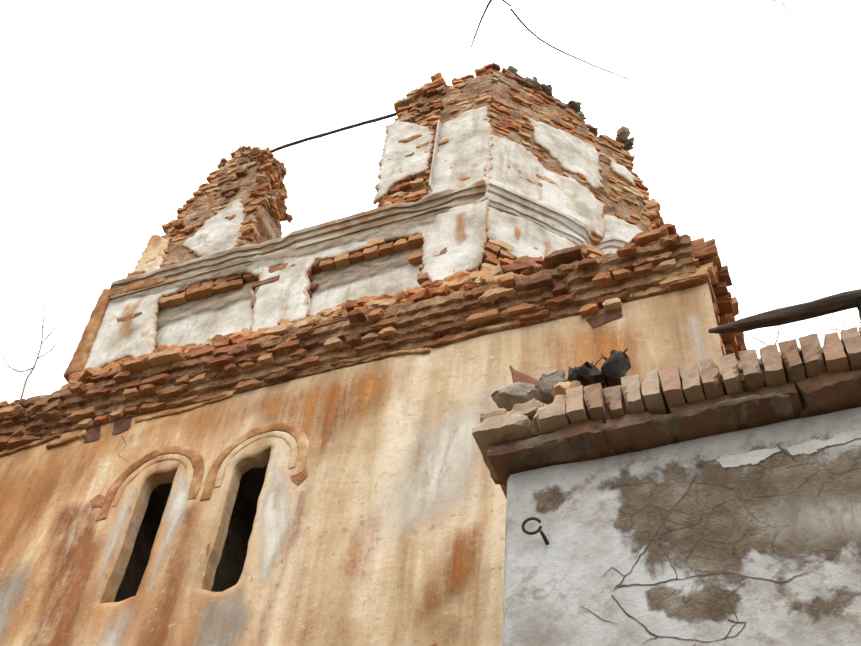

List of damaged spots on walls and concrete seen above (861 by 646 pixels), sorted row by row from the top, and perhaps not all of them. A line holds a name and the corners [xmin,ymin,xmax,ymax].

rust [566,332,632,373]
rust [36,508,96,646]
rust [428,531,475,608]
crack [580,474,809,646]
flaking render [598,429,861,623]